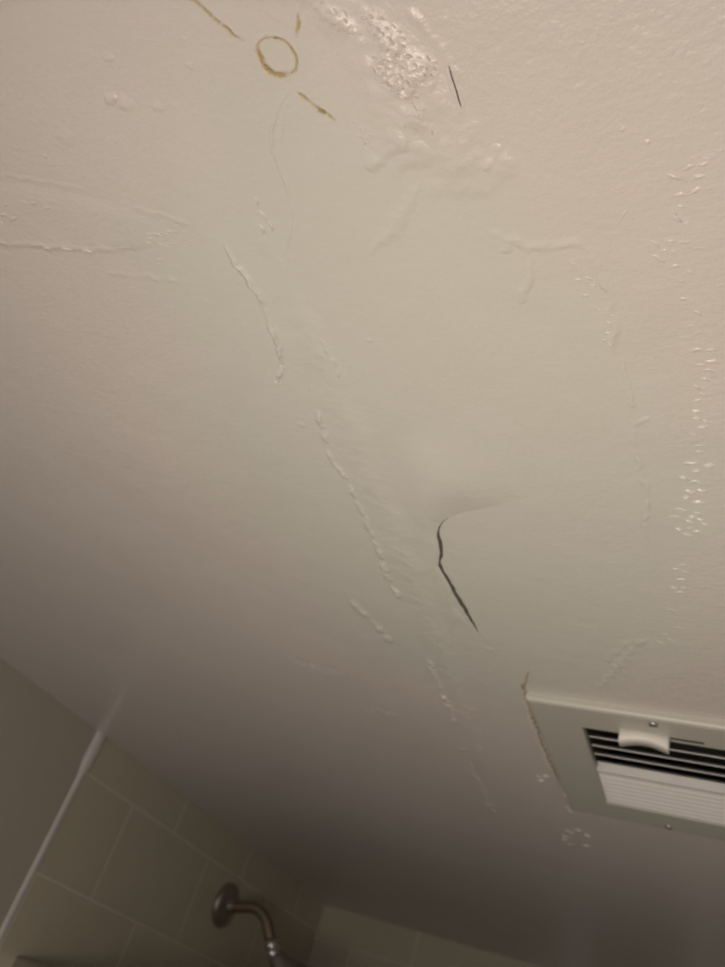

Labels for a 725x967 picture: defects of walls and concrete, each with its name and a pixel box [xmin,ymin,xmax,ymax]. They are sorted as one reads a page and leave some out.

crack [437,518,501,650]